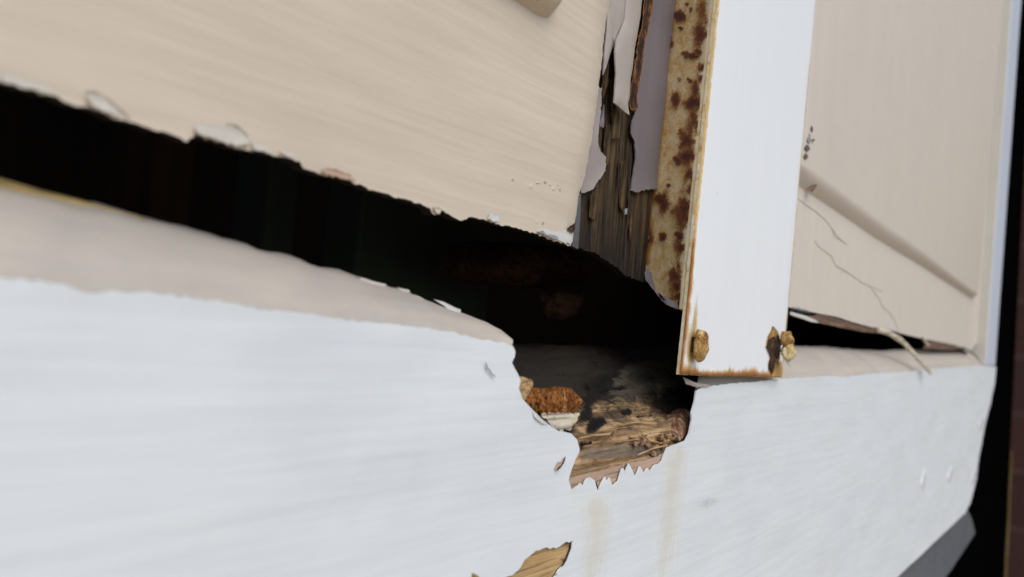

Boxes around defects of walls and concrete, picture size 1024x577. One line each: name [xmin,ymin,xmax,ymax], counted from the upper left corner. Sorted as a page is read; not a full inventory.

peeling [1,74,51,94]
peeling [85,90,131,118]
peeling [194,123,295,158]
peeling [536,0,675,249]
peeling [321,168,356,182]
corrosion [646,0,810,378]
crack [800,200,899,333]
peeling [360,278,461,313]
peeling [645,269,680,310]
spalling [579,372,626,449]
spalling [621,377,712,418]
peeling [507,541,572,577]